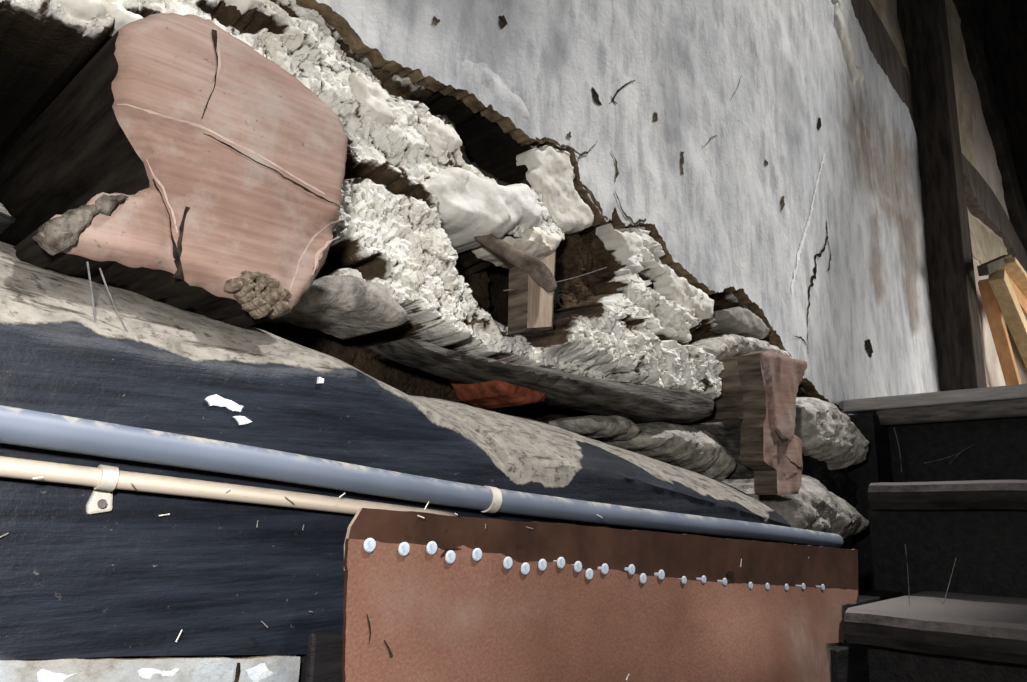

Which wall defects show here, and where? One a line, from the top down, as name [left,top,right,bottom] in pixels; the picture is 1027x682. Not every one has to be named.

peeling [833,0,864,89]
spalling [0,0,748,424]
crack [796,220,831,357]
spalling [796,383,813,398]
crack [233,663,241,682]